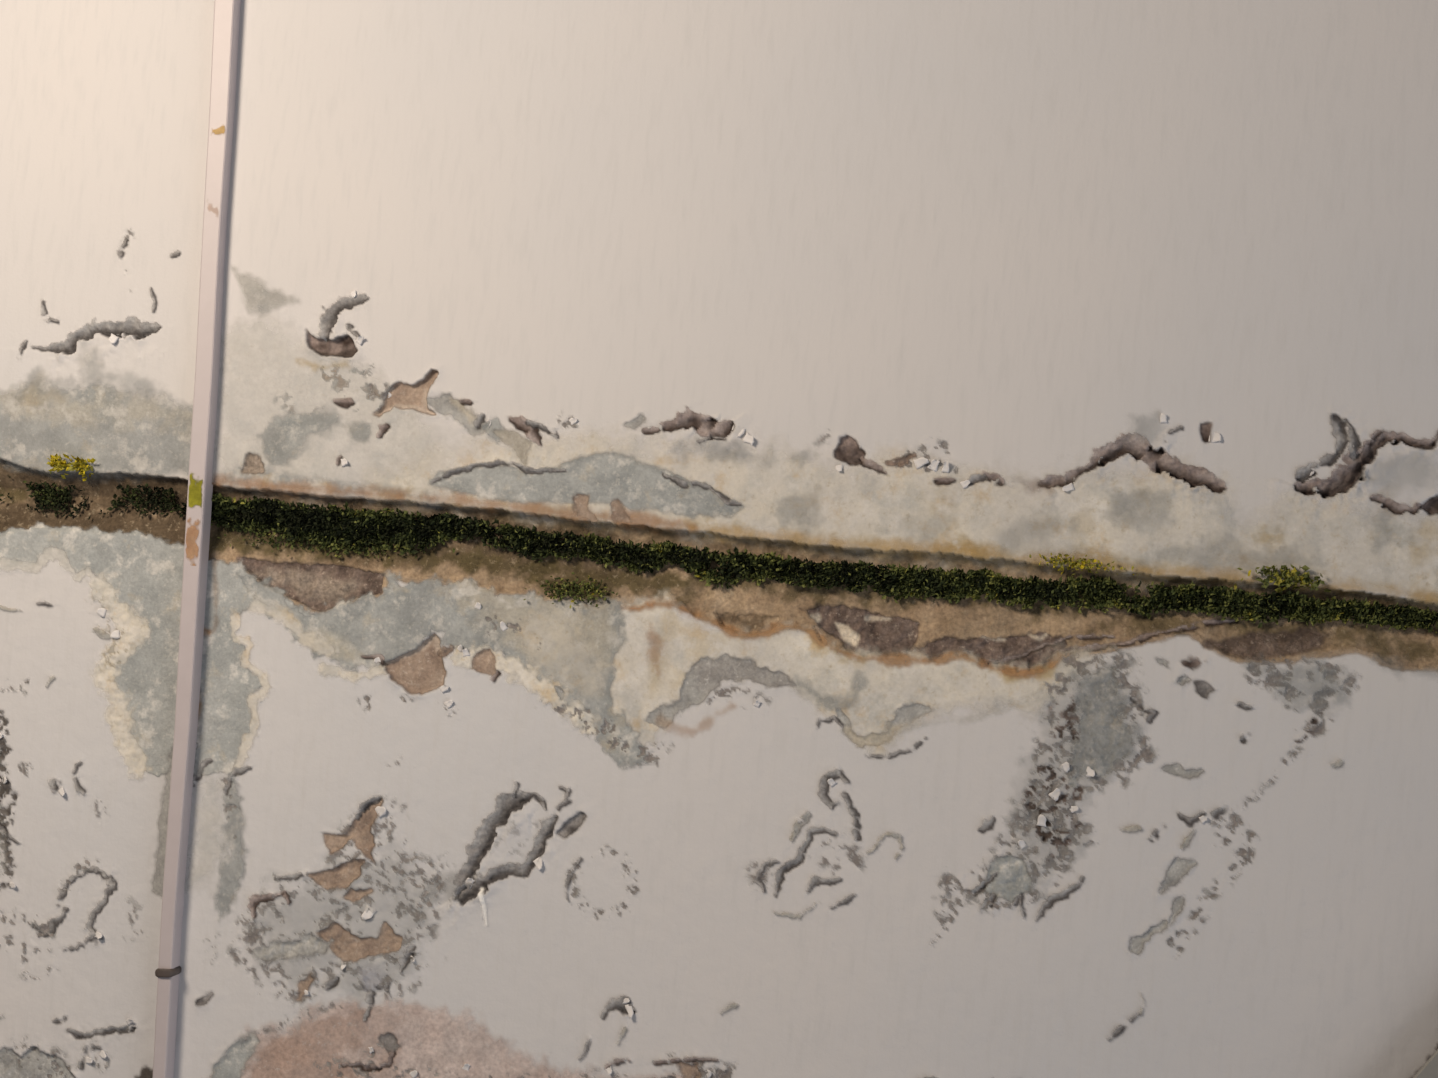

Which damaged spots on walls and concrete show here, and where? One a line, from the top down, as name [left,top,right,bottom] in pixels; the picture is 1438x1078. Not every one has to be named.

flaking render [307,290,368,358]
damp [0,382,193,474]
damp [470,434,1438,601]
peeling [0,710,32,889]
peeling [1,860,117,980]
damp [0,523,184,896]
peeling [229,782,586,1021]
flaking render [361,634,501,716]
damp [193,559,1089,916]
peeling [747,769,904,919]
peeling [806,605,1204,943]
peeling [1121,628,1356,955]